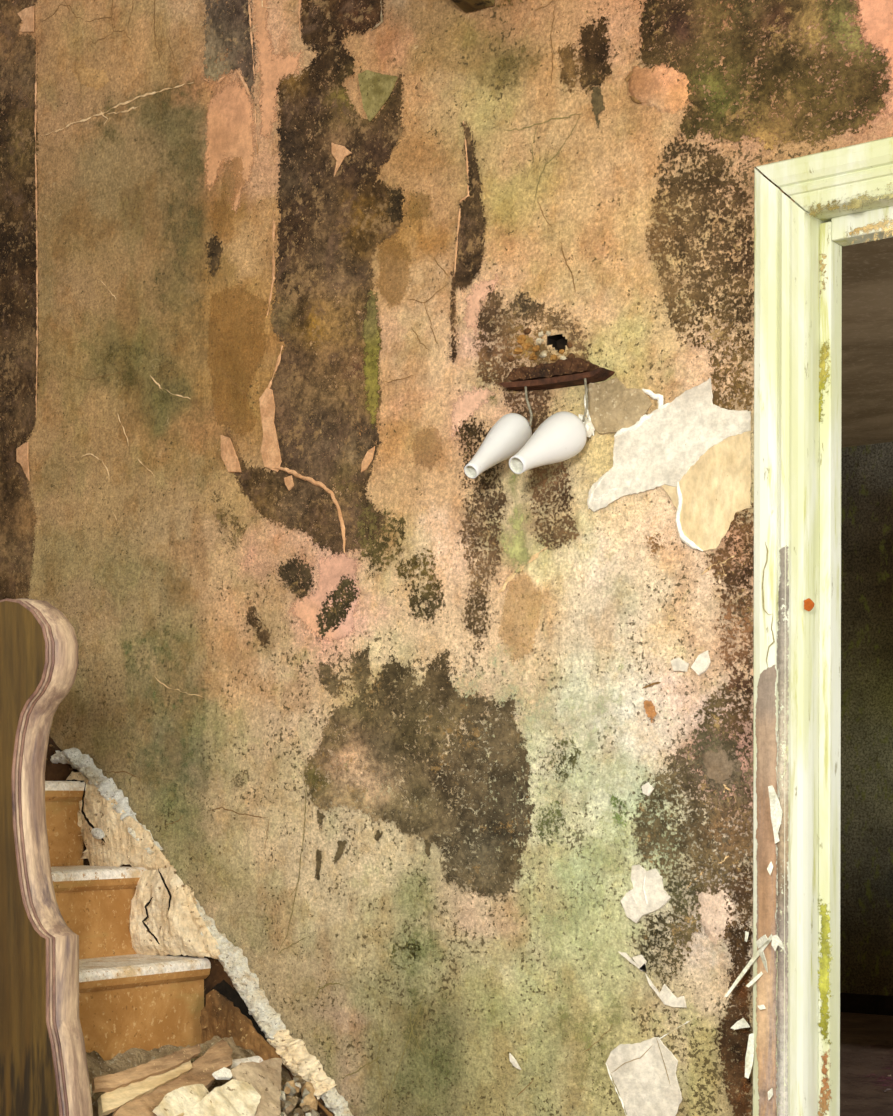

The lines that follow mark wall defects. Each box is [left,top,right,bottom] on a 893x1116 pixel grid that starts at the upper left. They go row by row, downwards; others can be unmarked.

damp [554,13,613,128]
damp [635,0,893,411]
mould [351,501,446,629]
peeling [450,377,555,650]
flaking render [524,377,752,553]
flaking render [50,748,164,855]
damp [300,643,566,898]
mould [550,735,581,783]
flaking render [621,865,671,923]
mould [609,503,754,1116]
flaking render [196,900,353,1116]
flaking render [605,951,693,1116]